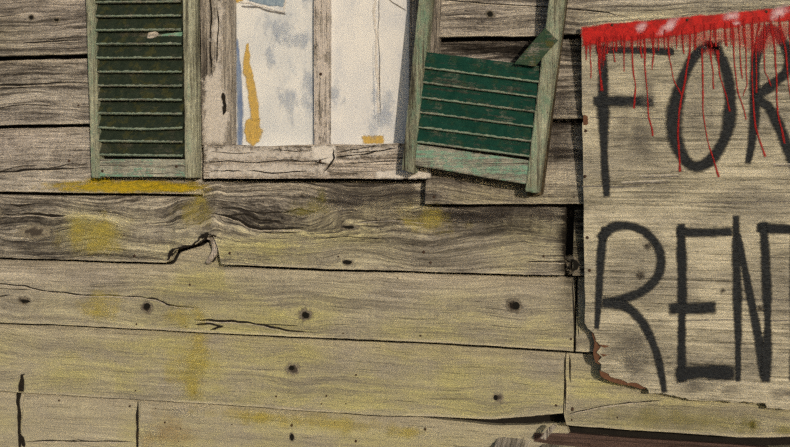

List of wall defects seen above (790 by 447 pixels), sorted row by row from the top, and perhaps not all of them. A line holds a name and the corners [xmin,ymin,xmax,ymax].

leakage [53,178,202,193]
crack [0,283,312,334]
crack [16,373,139,447]